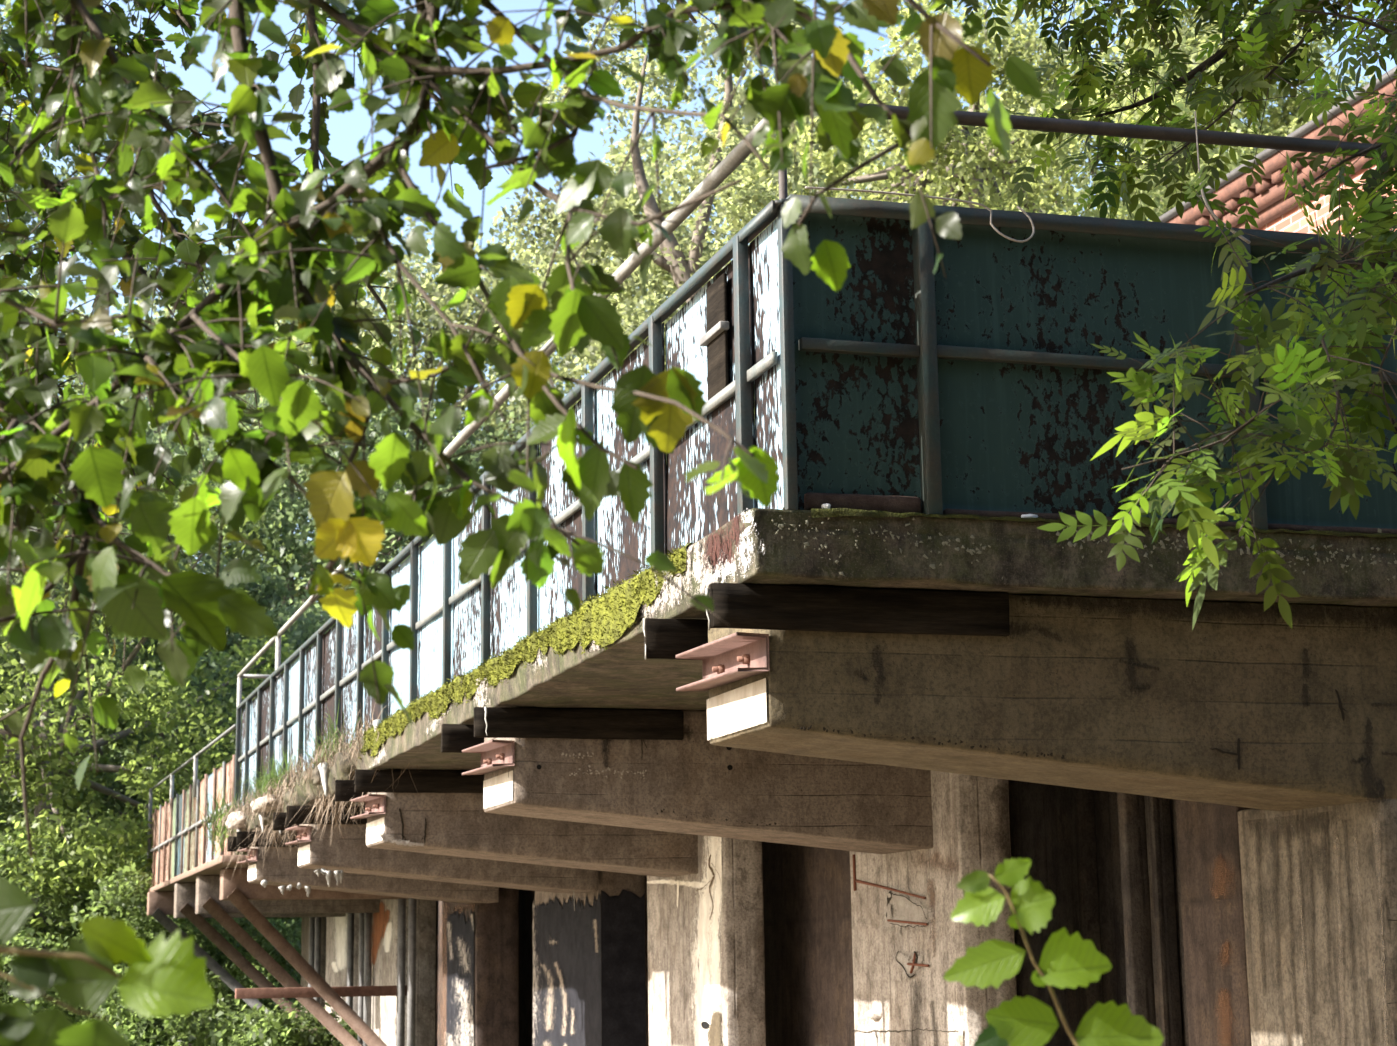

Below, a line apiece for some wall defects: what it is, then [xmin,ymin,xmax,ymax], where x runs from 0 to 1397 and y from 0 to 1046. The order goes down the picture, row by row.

water stain [471,677,494,710]
corrosion [371,901,390,965]
peeling [444,914,474,1046]
peeling [533,903,576,1046]